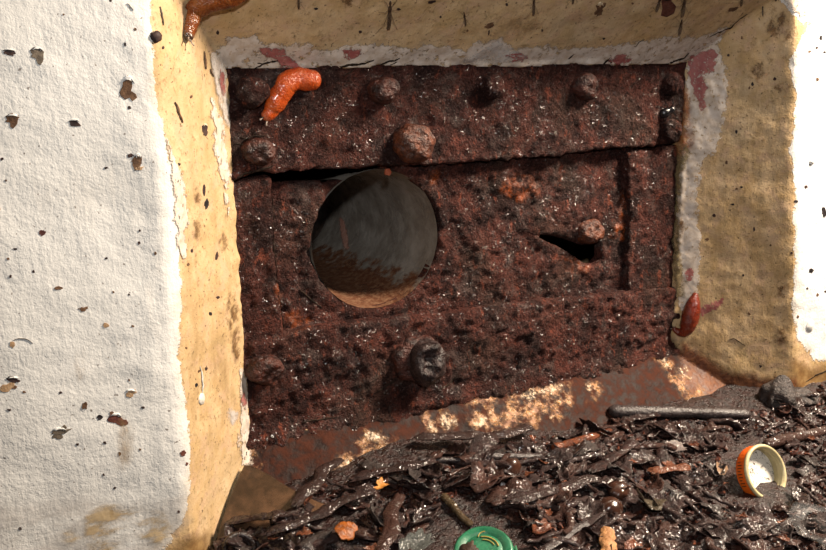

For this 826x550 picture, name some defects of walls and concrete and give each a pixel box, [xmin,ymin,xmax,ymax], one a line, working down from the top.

spalling [594,2,606,17]
peeling [661,0,676,17]
peeling [785,0,807,17]
peeling [150,30,165,49]
corrosion [500,176,538,201]
peeling [166,138,193,266]
peeling [229,365,254,465]
corrosion [244,342,776,484]